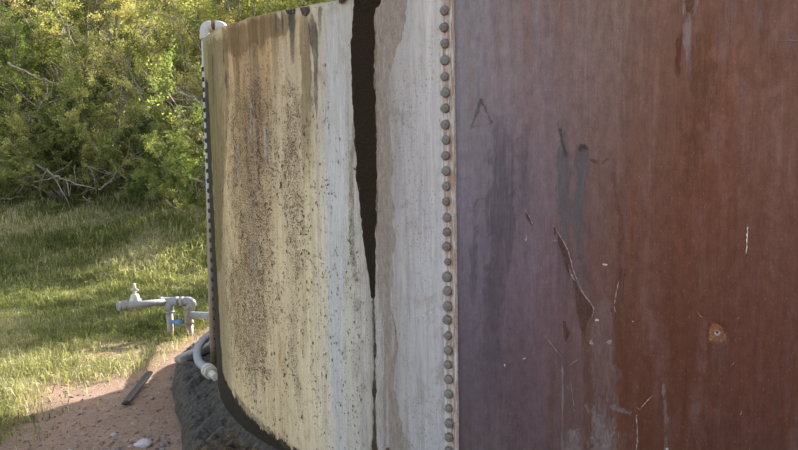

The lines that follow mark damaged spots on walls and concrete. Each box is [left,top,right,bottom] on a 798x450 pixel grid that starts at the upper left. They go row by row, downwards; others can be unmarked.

damp [205,80,297,450]
damp [281,8,295,37]
damp [308,23,318,80]
damp [323,47,347,396]
damp [371,0,407,450]
peeling [552,227,599,345]